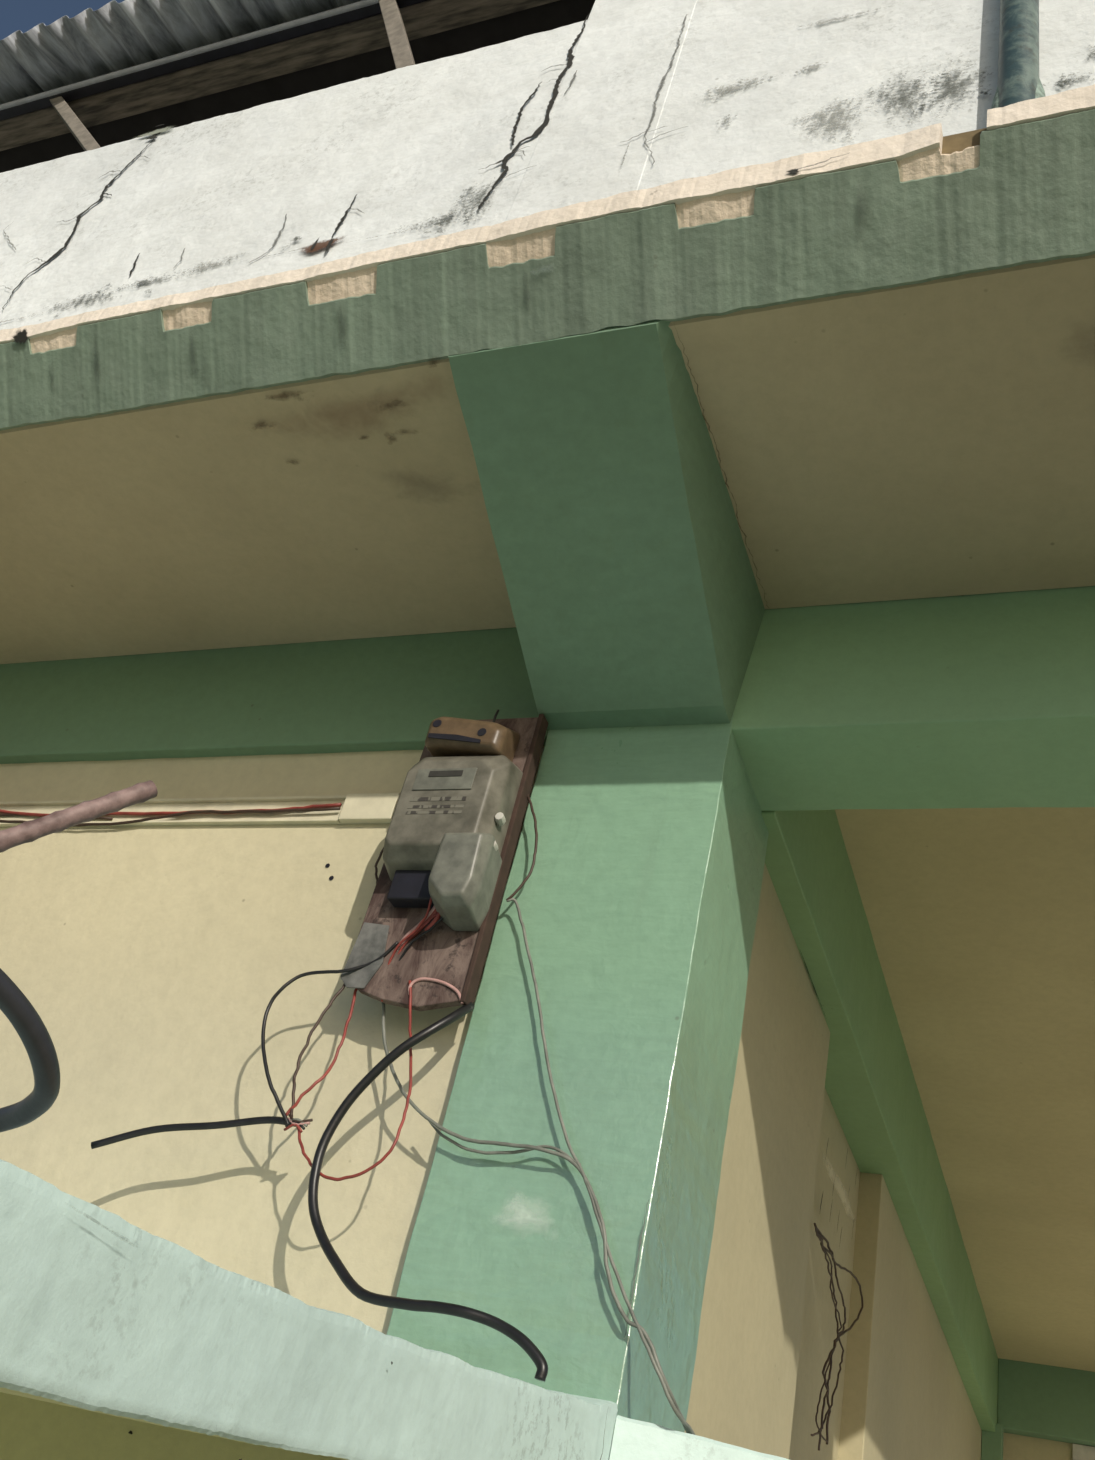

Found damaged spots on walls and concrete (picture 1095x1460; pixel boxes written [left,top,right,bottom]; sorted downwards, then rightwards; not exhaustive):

crack [478,15,589,209]
crack [623,14,688,165]
leakage [795,60,991,140]
crack [3,133,159,307]
crack [249,214,287,263]
crack [332,194,364,238]